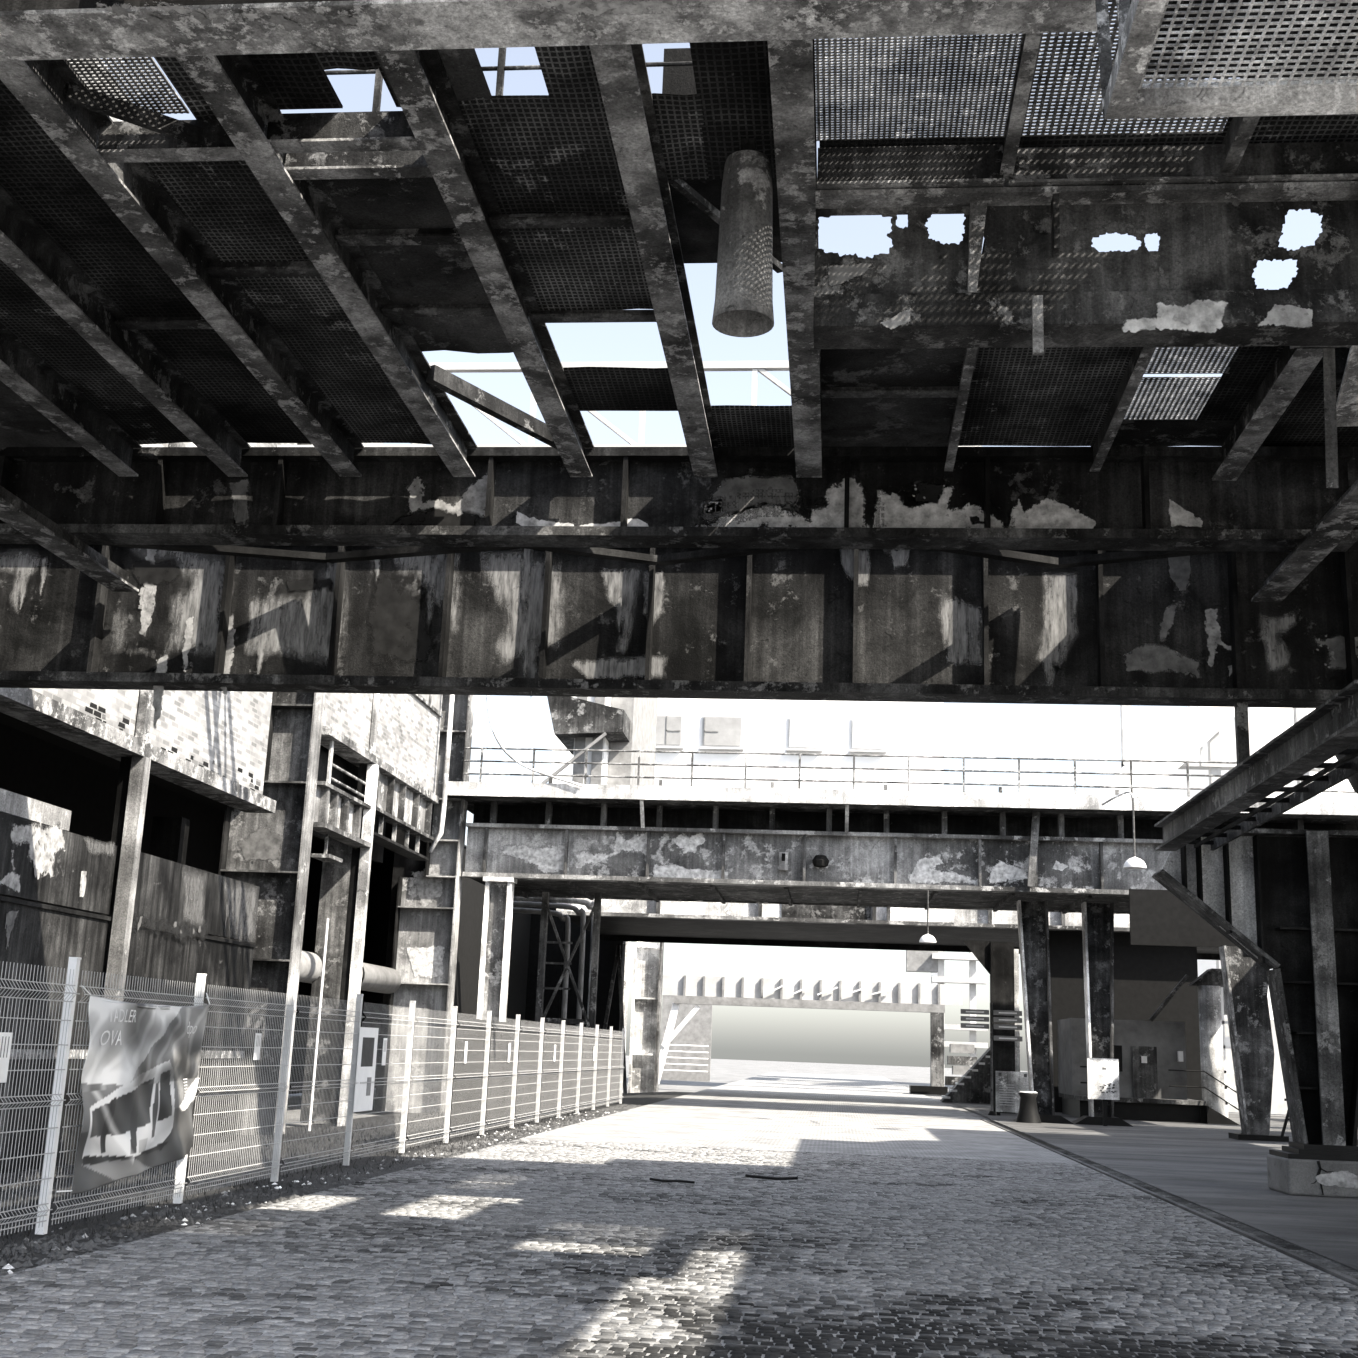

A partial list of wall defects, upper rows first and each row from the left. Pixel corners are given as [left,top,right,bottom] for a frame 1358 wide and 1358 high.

peeling [408,474,496,517]
peeling [701,475,800,521]
peeling [482,548,564,696]
peeling [643,572,664,622]
peeling [0,822,66,892]
peeling [495,832,728,879]